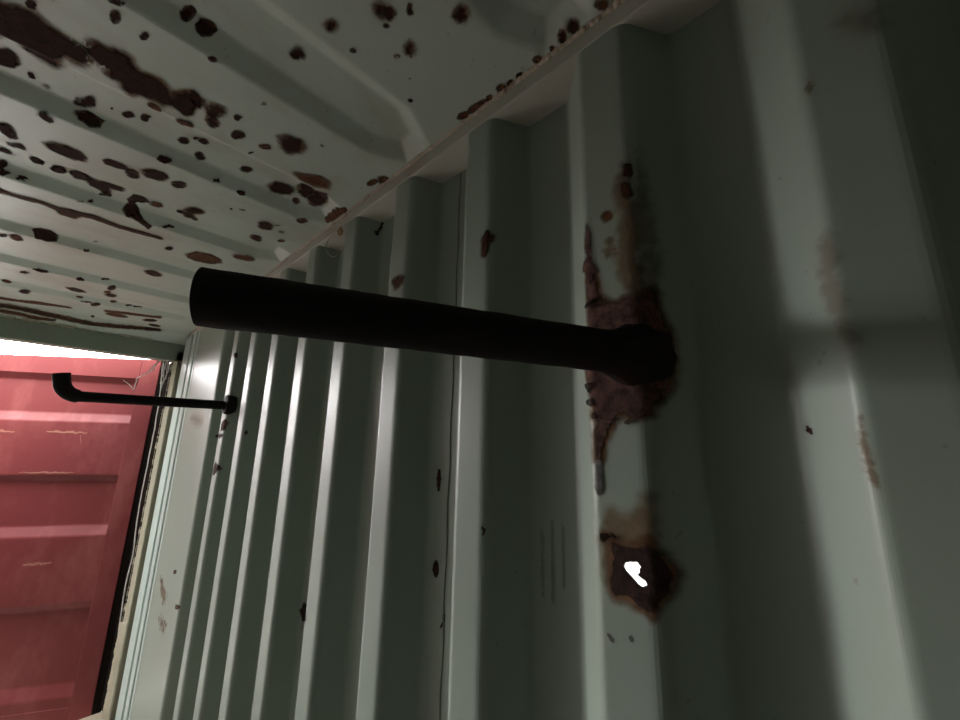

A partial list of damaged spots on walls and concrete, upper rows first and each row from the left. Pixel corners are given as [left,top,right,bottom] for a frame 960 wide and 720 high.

rust [325,19,338,33]
rust [372,0,414,28]
rust [452,4,470,24]
rust [594,0,608,11]
rust [394,42,415,58]
rust [532,18,579,64]
rust [457,72,523,120]
rust [367,176,389,186]
rust [582,163,679,496]
rust [601,508,683,622]